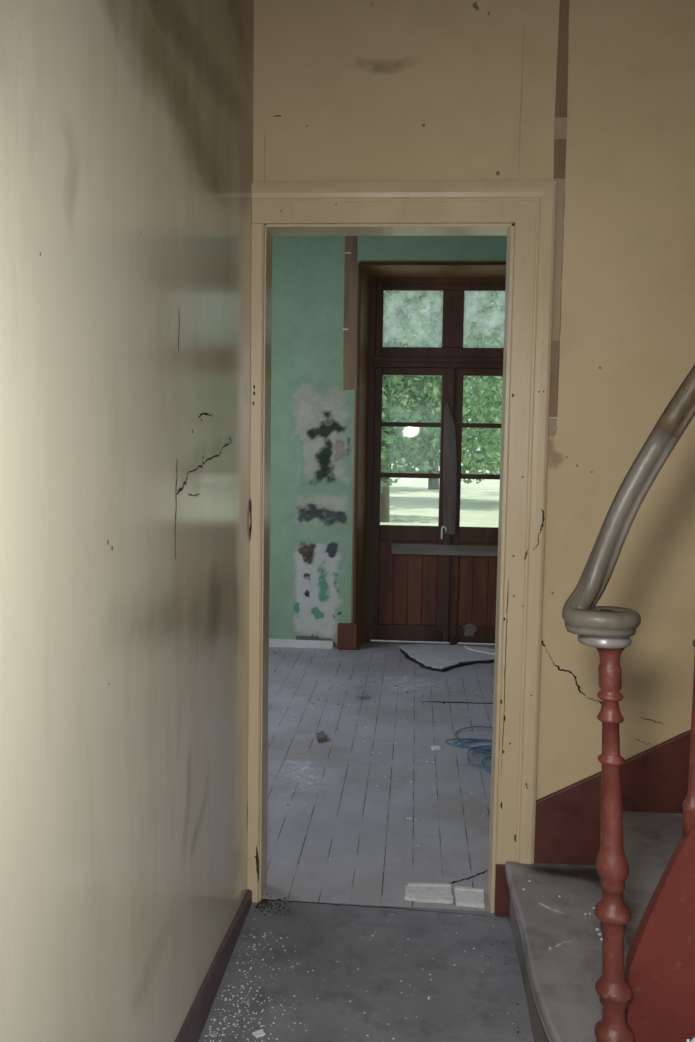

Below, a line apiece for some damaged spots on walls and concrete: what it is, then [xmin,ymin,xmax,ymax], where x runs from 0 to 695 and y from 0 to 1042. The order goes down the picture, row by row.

crack [175,412,232,559]
peeling [284,378,355,647]
peeling [500,581,515,776]
crack [541,641,602,704]